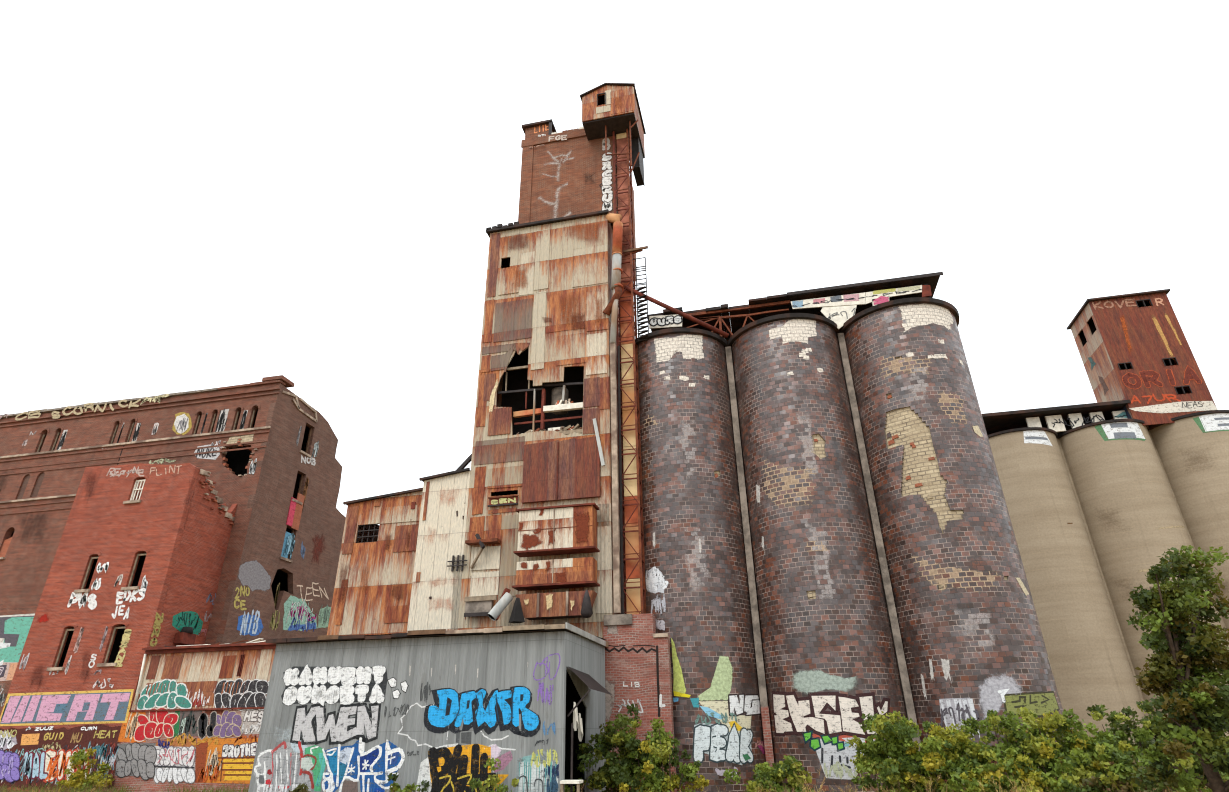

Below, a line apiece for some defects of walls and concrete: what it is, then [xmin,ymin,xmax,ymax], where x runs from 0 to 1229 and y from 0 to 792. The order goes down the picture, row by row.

corrosion [509,235,528,248]
corrosion [545,297,606,329]
peeling [489,380,498,412]
spalling [808,434,826,459]
spalling [199,431,258,525]
spalling [885,394,964,534]
corrosion [338,566,368,601]